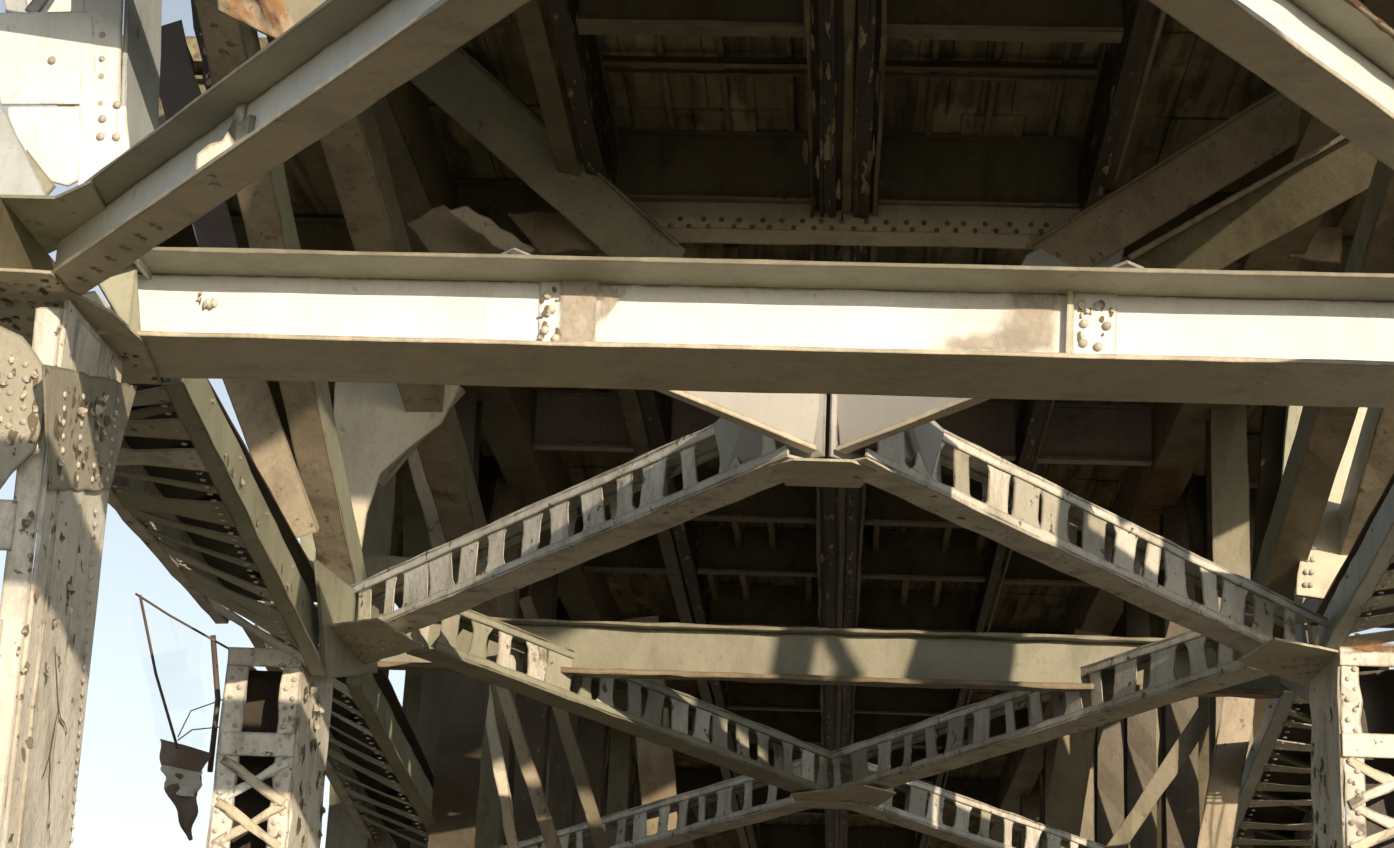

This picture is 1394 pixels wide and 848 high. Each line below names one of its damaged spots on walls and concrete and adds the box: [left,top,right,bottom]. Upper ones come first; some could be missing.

rust [228,0,290,30]
peeling [802,0,887,221]
peeling [0,355,116,489]
peeling [816,483,866,628]